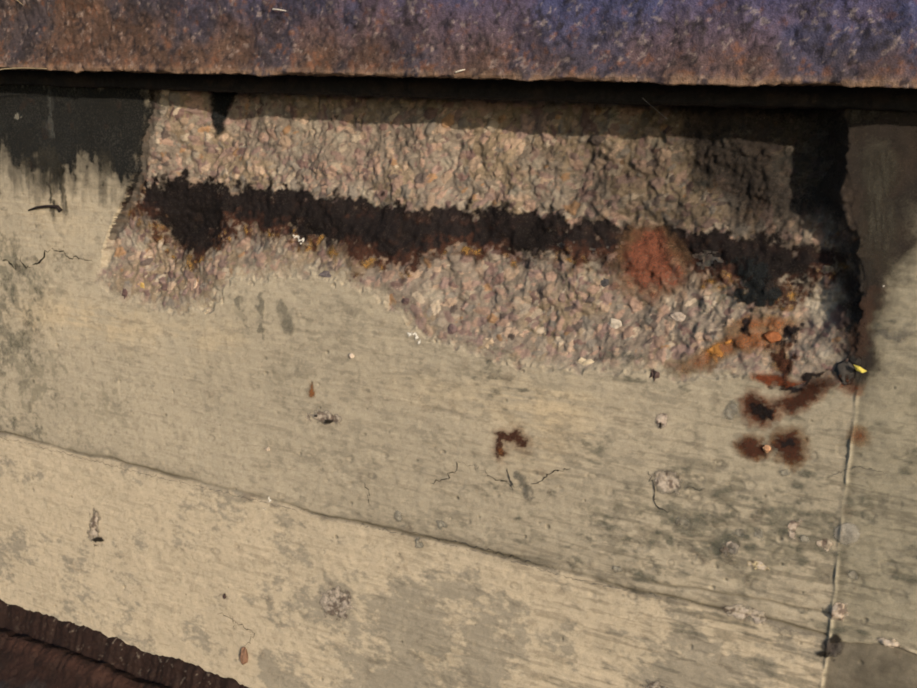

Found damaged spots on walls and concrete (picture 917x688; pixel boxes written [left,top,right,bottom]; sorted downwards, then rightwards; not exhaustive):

water stain [0,84,155,215]
spalling [93,89,860,391]
crack [1,248,92,270]
rust [124,169,861,426]
rust [495,429,528,459]
rust [734,430,808,466]
rust [240,647,248,665]